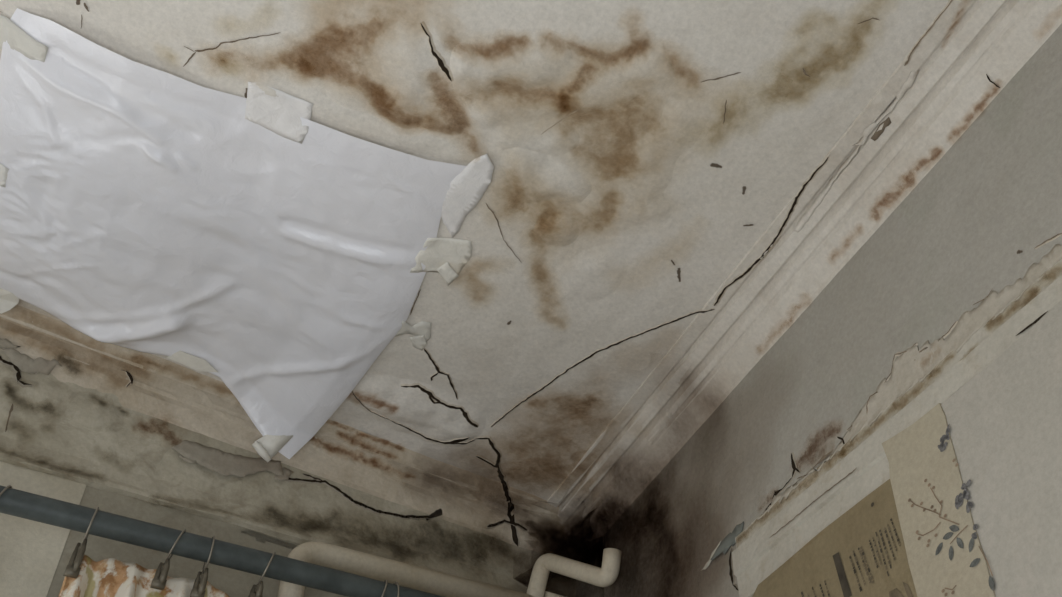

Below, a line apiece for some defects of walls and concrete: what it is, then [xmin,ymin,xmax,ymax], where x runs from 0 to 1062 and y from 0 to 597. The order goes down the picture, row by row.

crack [183,32,281,67]
crack [903,0,953,66]
crack [702,72,741,123]
crack [352,157,830,546]
crack [0,355,32,432]
peeling [702,244,1062,570]
crack [285,473,431,520]
leakage [527,503,697,597]